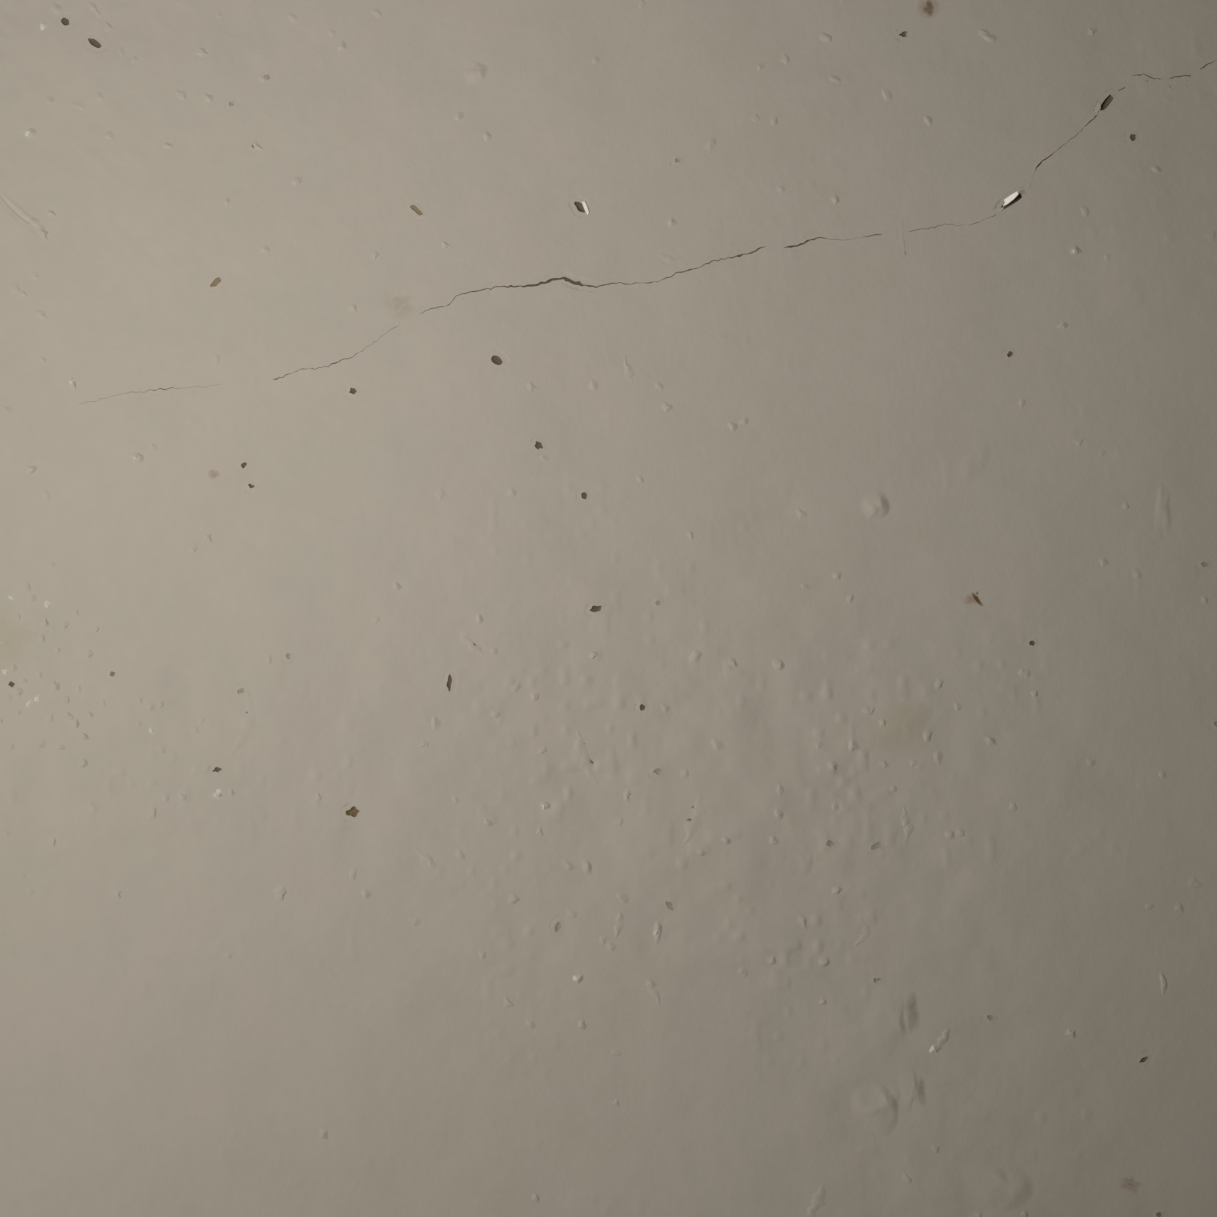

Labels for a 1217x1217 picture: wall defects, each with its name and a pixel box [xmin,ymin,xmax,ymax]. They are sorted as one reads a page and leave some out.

crack [268,55,1217,384]
crack [75,379,224,410]